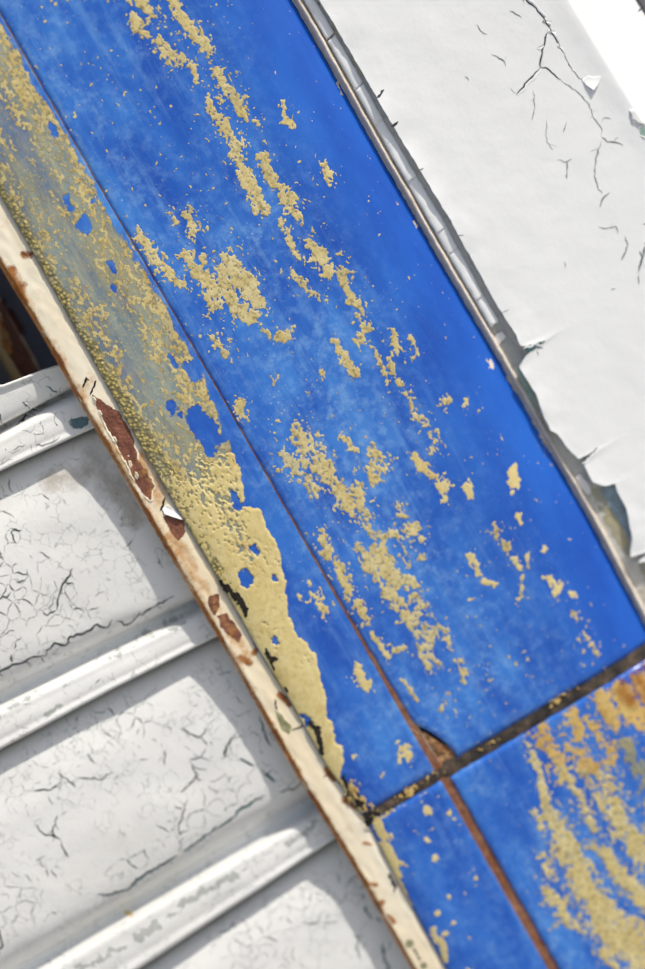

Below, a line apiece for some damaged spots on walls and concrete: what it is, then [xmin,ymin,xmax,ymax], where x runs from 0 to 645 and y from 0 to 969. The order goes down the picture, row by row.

crack [511,0,645,282]
peeling [0,0,483,906]
flaking render [292,0,645,624]
corrosion [0,260,416,969]
peeling [570,610,601,659]
crack [0,660,391,969]
crack [388,873,397,893]
peeling [430,910,456,963]
peeling [519,671,645,969]